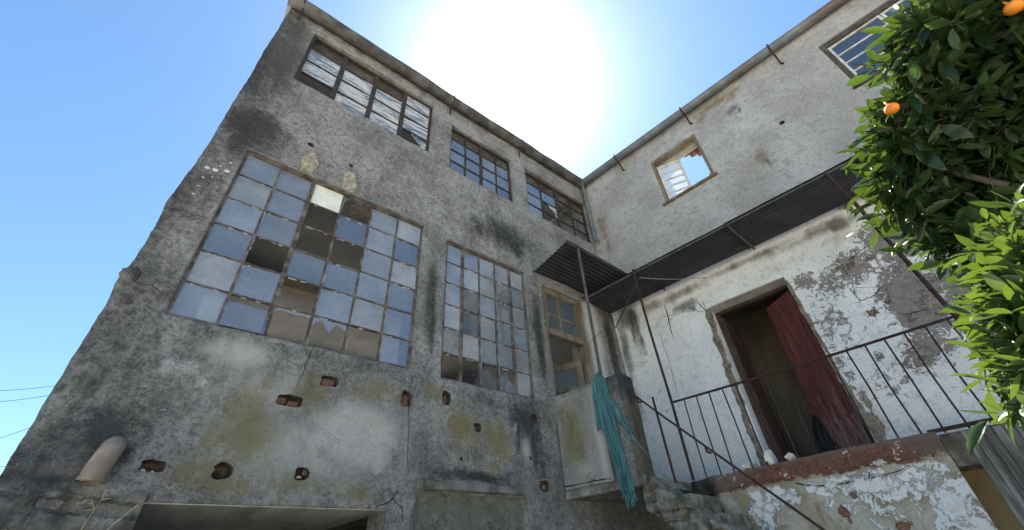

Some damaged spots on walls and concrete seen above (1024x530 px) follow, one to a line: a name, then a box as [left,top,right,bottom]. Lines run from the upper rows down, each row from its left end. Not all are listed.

flaking render [300,143,320,176]
flaking render [341,164,357,195]
water stain [476,218,523,257]
peeling [835,235,953,322]
water stain [426,268,436,352]
flaking render [785,280,886,442]
peeling [874,341,946,378]
spalling [276,394,308,407]
spalling [320,375,339,387]
peeling [750,459,978,530]